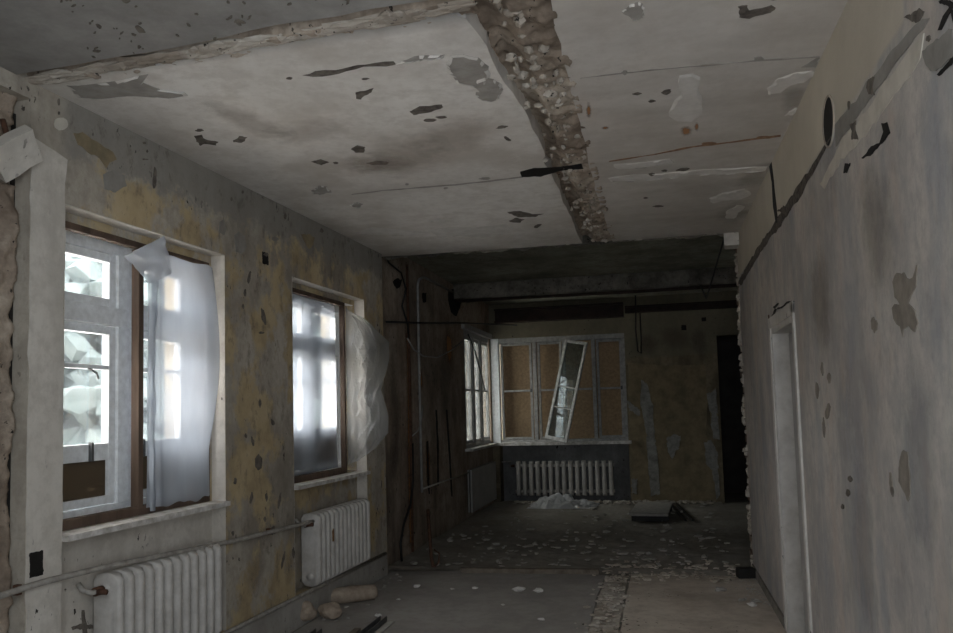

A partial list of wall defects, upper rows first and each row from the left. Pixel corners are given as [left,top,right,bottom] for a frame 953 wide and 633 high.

spalling [0,91,17,136]
spalling [25,0,768,260]
peeling [738,5,776,19]
peeling [820,8,953,189]
peeling [892,264,919,337]
spalling [0,178,20,633]